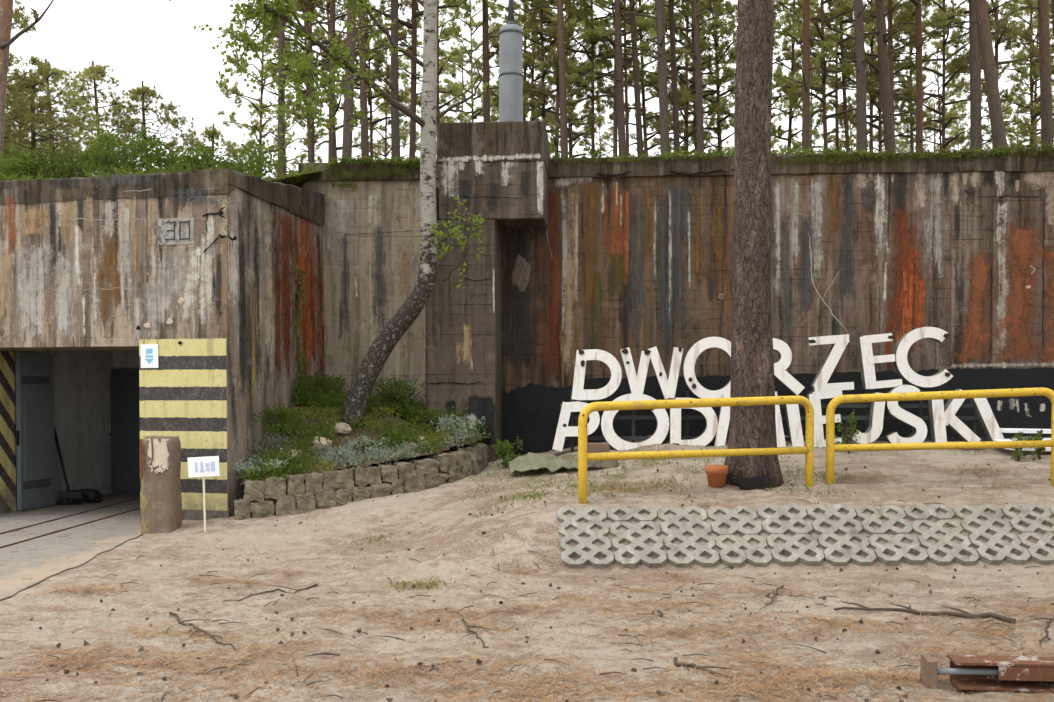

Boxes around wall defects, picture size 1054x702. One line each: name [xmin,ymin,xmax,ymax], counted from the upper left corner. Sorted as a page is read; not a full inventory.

water stain [50,174,273,390]
corrosion [273,209,323,373]
corrosion [545,192,564,380]
water stain [441,154,691,370]
water stain [774,177,826,334]
corrosion [886,209,925,370]
corrosion [955,224,1054,369]